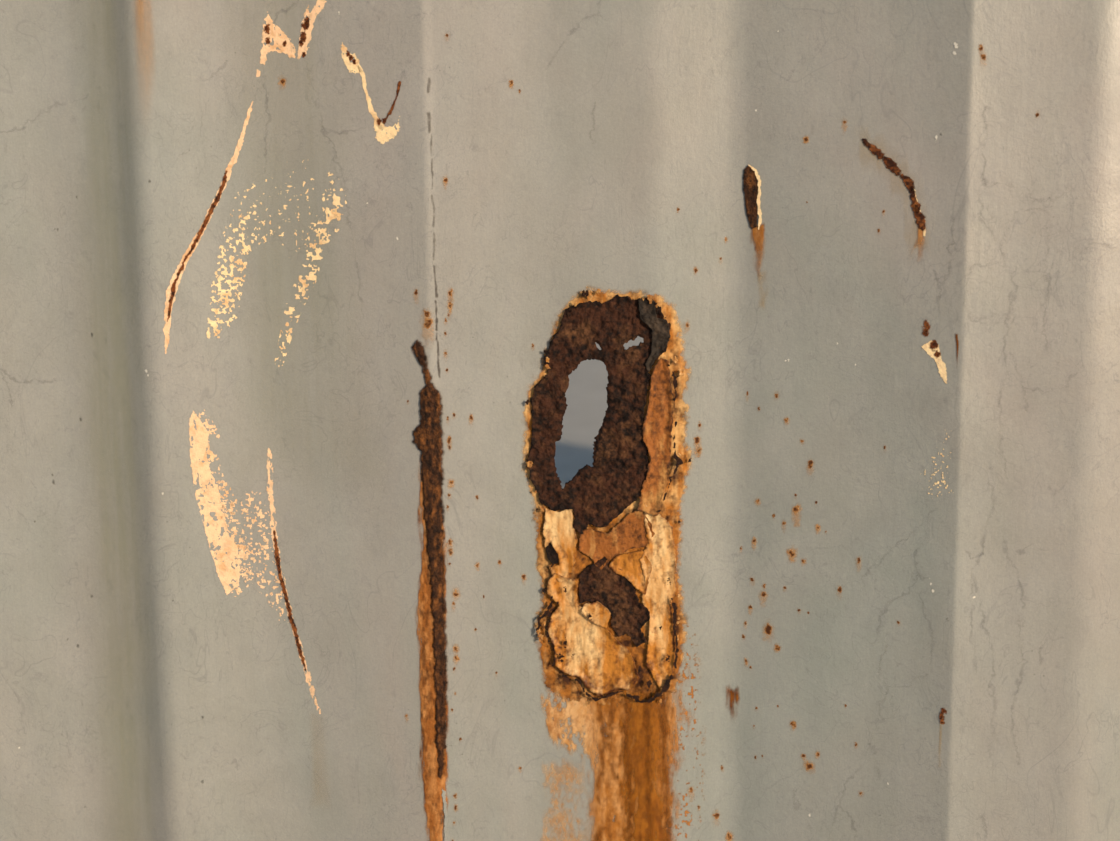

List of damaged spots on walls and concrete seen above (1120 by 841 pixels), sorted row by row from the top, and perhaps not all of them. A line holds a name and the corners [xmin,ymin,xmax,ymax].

peeling [206,160,347,367]
rust [423,289,453,335]
rust [743,165,765,265]
peeling [921,320,947,384]
peeling [189,410,288,621]
rust [405,340,462,841]
rust [522,287,702,841]
rust [727,689,739,712]